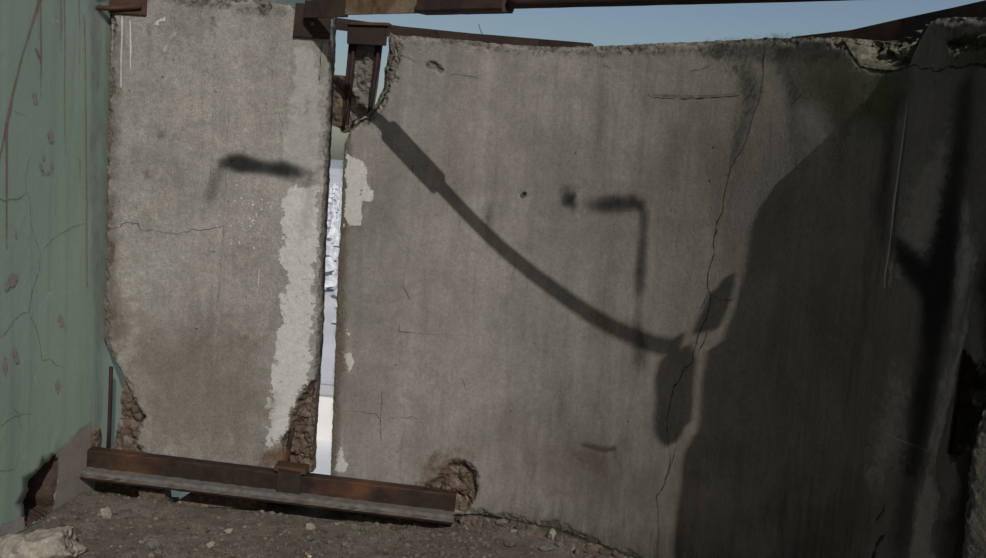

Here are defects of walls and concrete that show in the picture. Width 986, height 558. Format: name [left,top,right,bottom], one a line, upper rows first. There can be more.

spalling [342,33,395,128]
leakage [683,35,856,111]
crack [656,40,766,550]
peeling [954,248,975,323]
spalling [265,374,321,473]
spalling [947,348,986,481]
flaking render [23,424,92,528]
spalling [423,459,479,512]